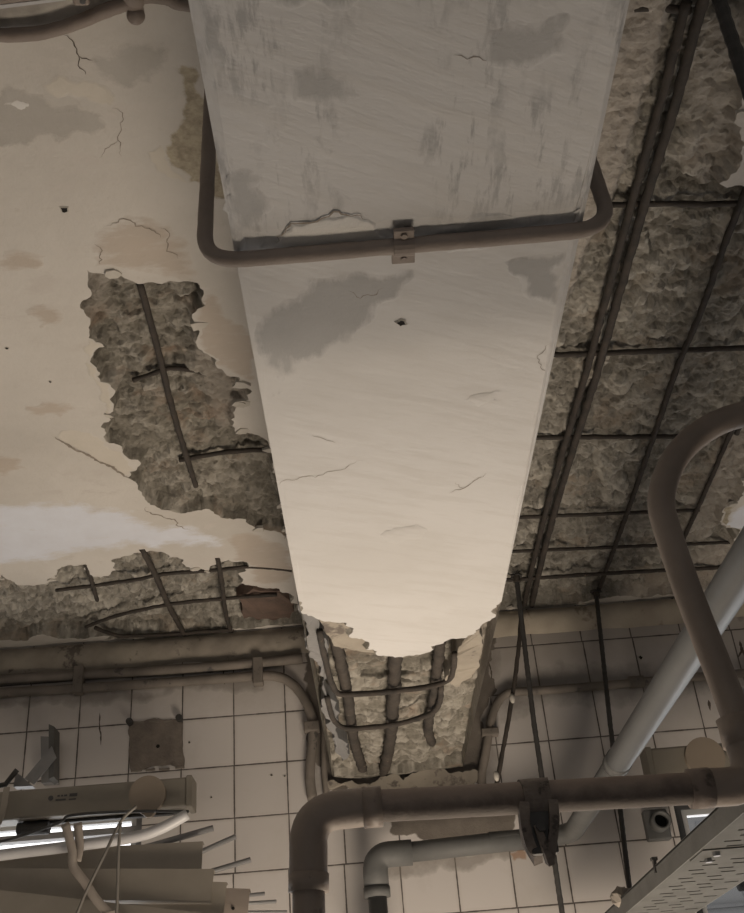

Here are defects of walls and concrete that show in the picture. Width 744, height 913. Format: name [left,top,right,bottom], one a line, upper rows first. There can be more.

crack [65,35,89,74]
flaking render [0,82,108,152]
flaking render [147,62,204,186]
flaking render [214,154,225,201]
spalling [500,0,744,610]
spalling [55,269,287,539]
spalling [0,549,501,778]